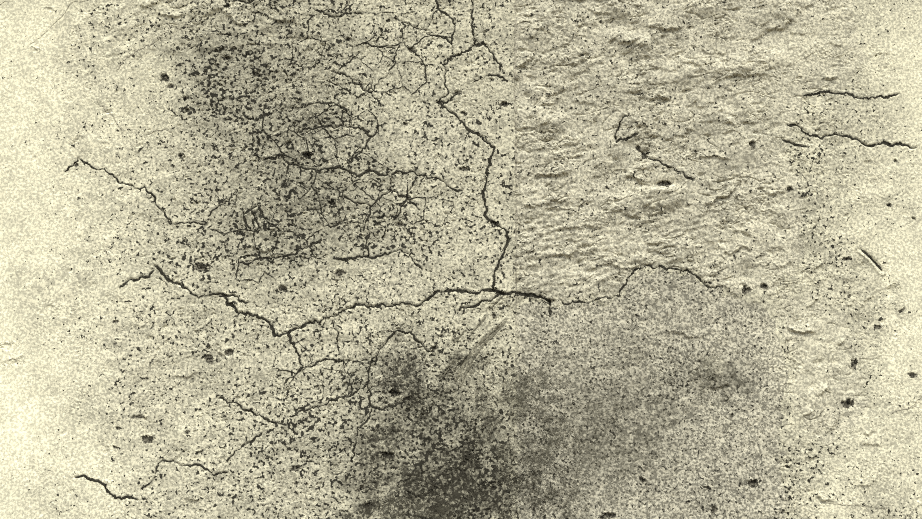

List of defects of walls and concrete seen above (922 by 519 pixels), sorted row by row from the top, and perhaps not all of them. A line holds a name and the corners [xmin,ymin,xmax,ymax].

crack [782,90,916,149]
crack [65,0,722,500]
flaking render [499,0,878,446]
damp [442,296,503,382]
damp [341,354,556,519]